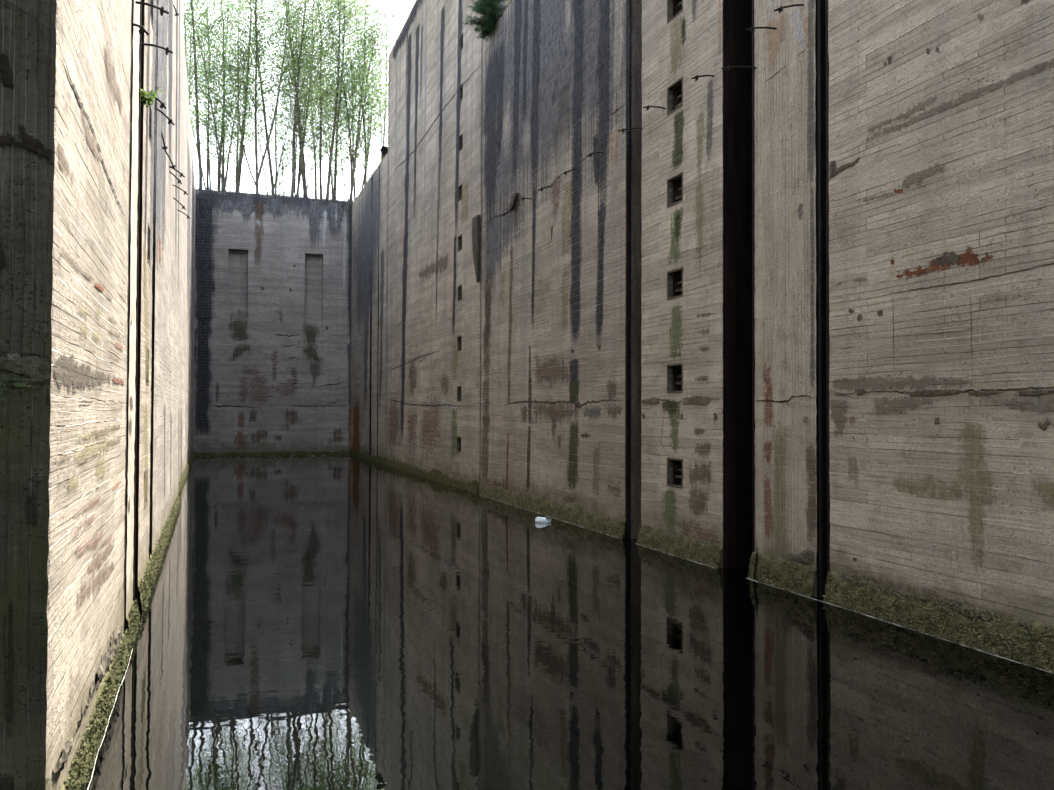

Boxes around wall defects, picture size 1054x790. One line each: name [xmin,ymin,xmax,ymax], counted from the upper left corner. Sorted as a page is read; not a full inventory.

water stain [497,43,505,159]
water stain [551,133,578,241]
water stain [149,0,212,486]
corrosion [890,247,993,279]
spalling [0,353,50,379]
corrosion [348,402,360,450]
crack [388,399,622,408]